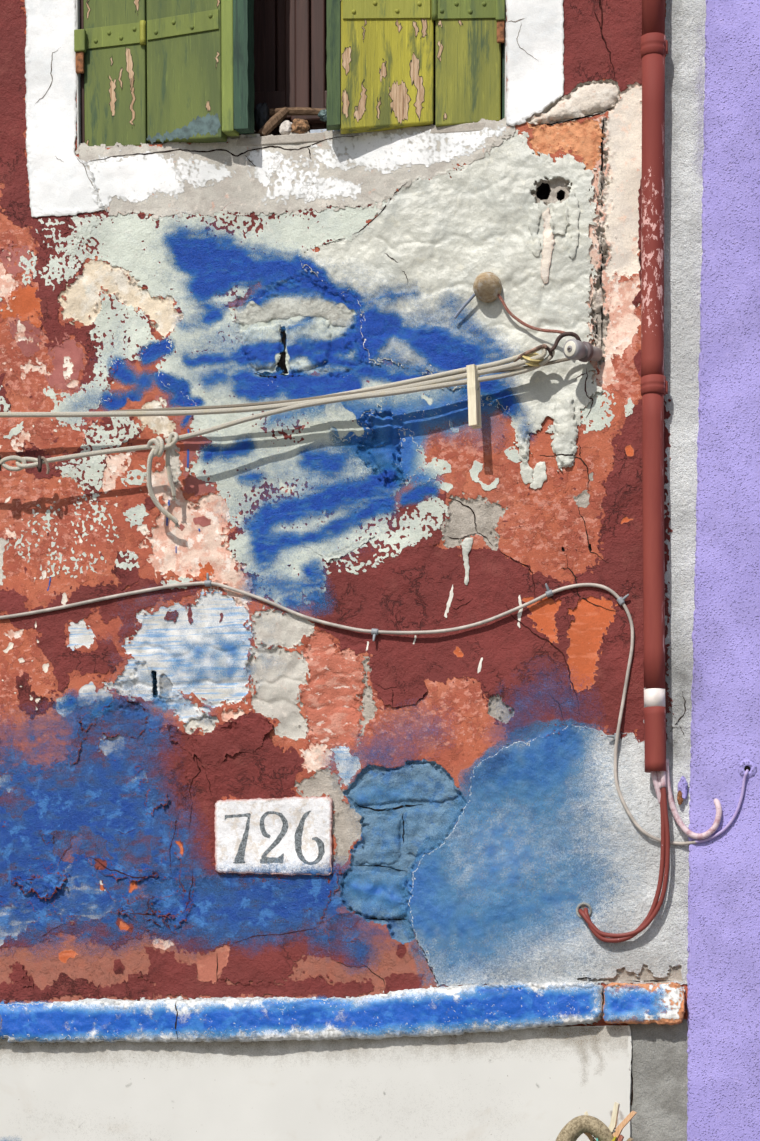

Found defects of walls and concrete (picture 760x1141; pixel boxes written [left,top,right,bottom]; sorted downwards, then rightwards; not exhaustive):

crack [594,0,614,71]
crack [56,135,356,187]
peeling [0,0,509,412]
crack [533,108,611,192]
peeling [526,0,642,434]
crack [574,247,603,418]
peeling [0,384,686,1034]
peeling [25,1016,378,1043]